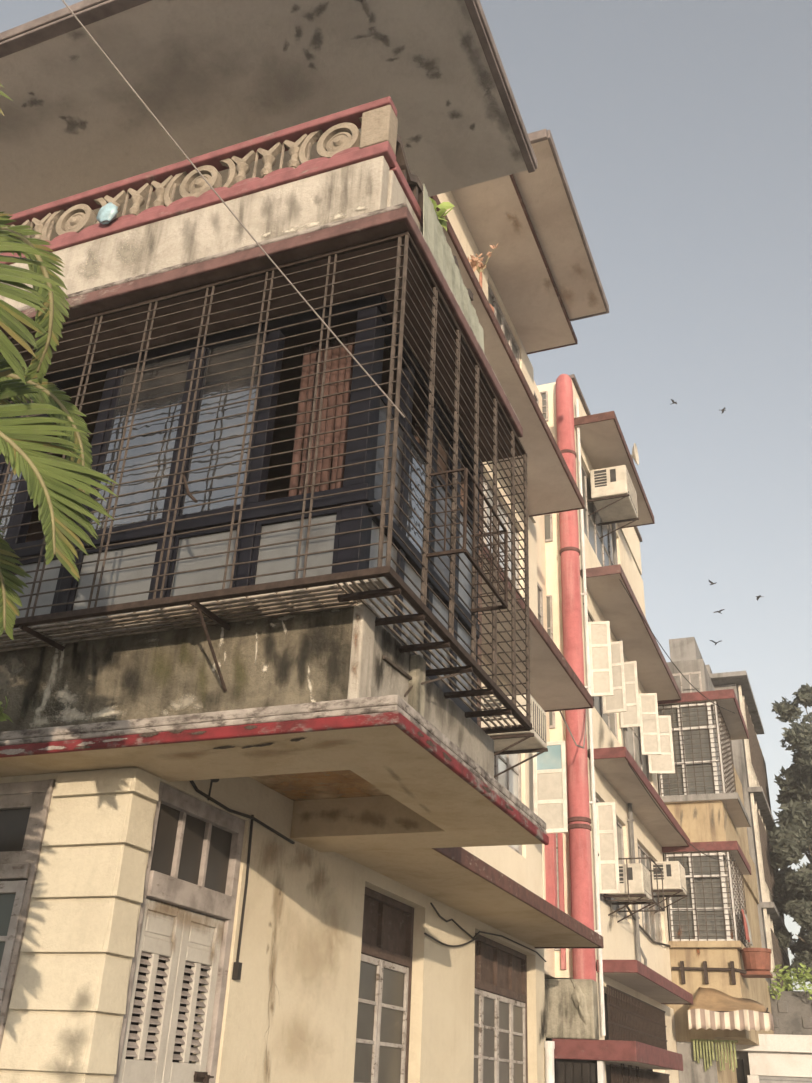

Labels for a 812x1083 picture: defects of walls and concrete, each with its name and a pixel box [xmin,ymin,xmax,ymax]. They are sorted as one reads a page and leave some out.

water stain [23,642,120,727]
spalling [162,697,201,715]
water stain [255,620,339,702]
water stain [376,628,413,687]
peeling [39,730,206,750]